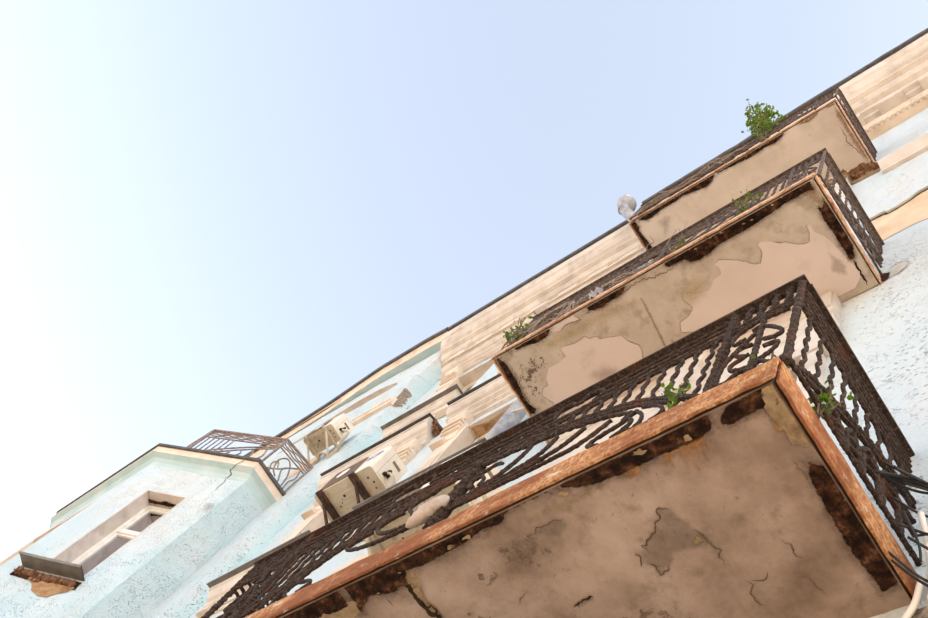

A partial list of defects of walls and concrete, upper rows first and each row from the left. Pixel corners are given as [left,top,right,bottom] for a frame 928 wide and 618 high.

spalling [841,161,881,184]
peeling [631,130,861,337]
spalling [284,384,811,618]
spalling [808,463,897,591]
flaking render [10,565,81,597]
corrosion [405,571,422,591]
crack [385,584,444,618]